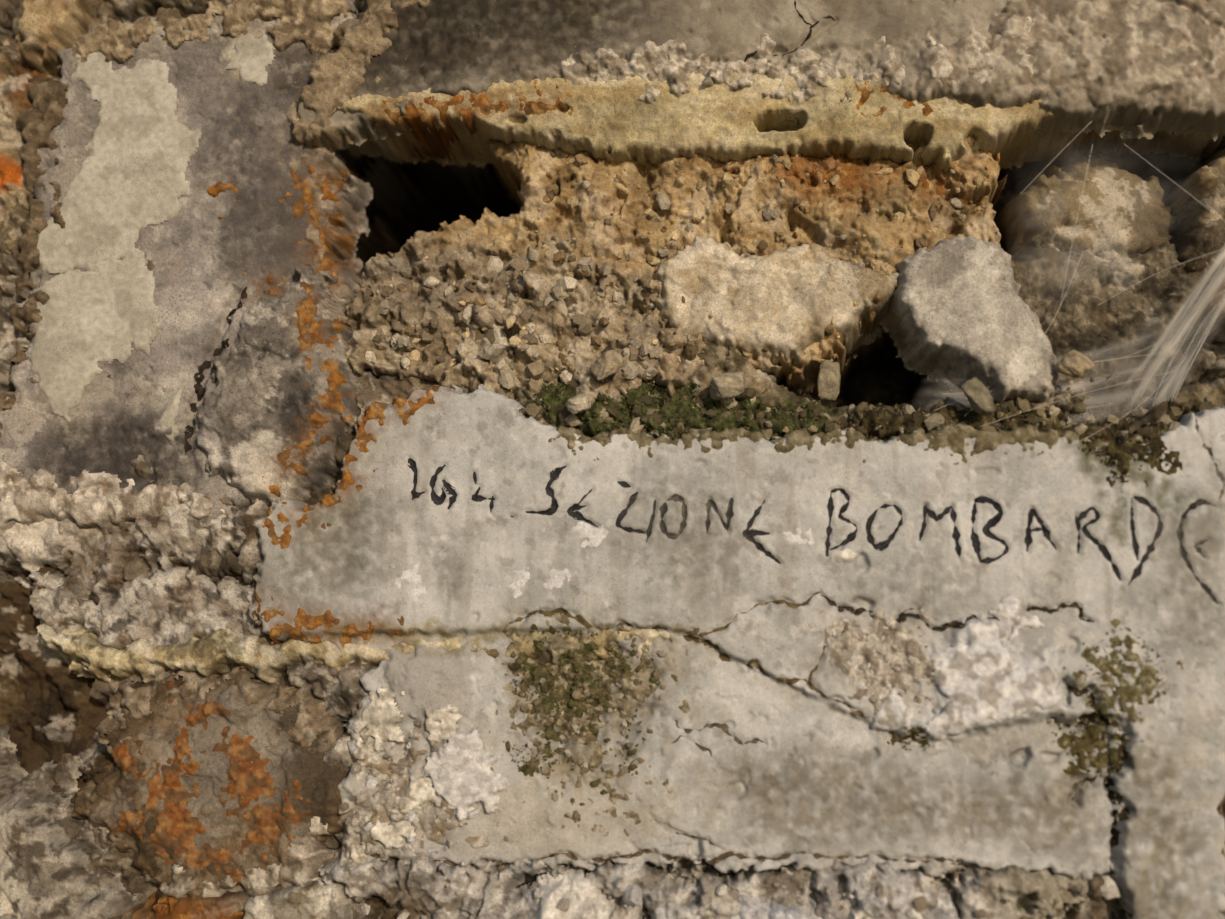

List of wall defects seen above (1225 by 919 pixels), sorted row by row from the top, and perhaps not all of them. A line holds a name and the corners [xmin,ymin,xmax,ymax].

crack [744,1,835,62]
crack [365,818,964,888]
crack [671,720,767,756]
crack [503,592,1095,740]
peeling [808,595,1062,745]
crack [1051,683,1133,919]